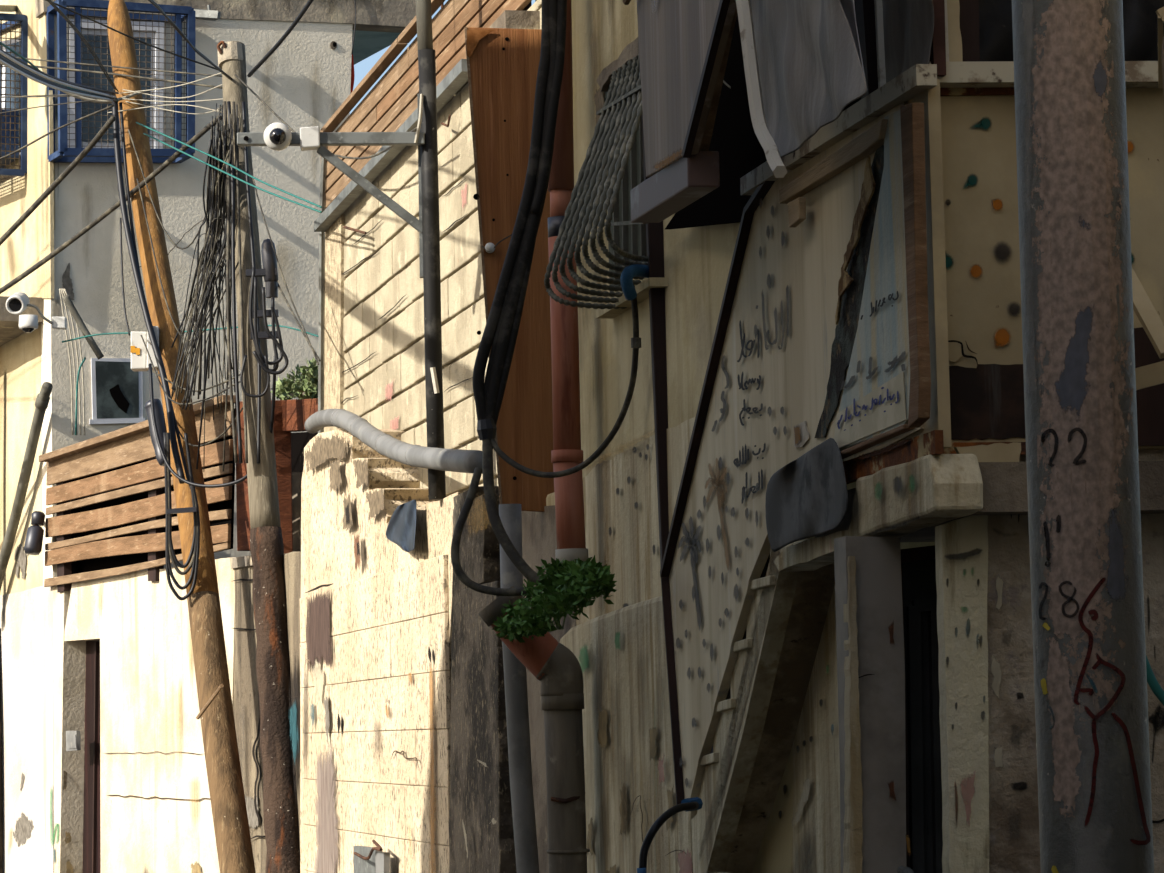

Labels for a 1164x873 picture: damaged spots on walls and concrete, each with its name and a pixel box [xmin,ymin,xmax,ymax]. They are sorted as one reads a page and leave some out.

crack [105,749,200,757]
crack [108,794,210,802]
peeling [13,811,33,847]